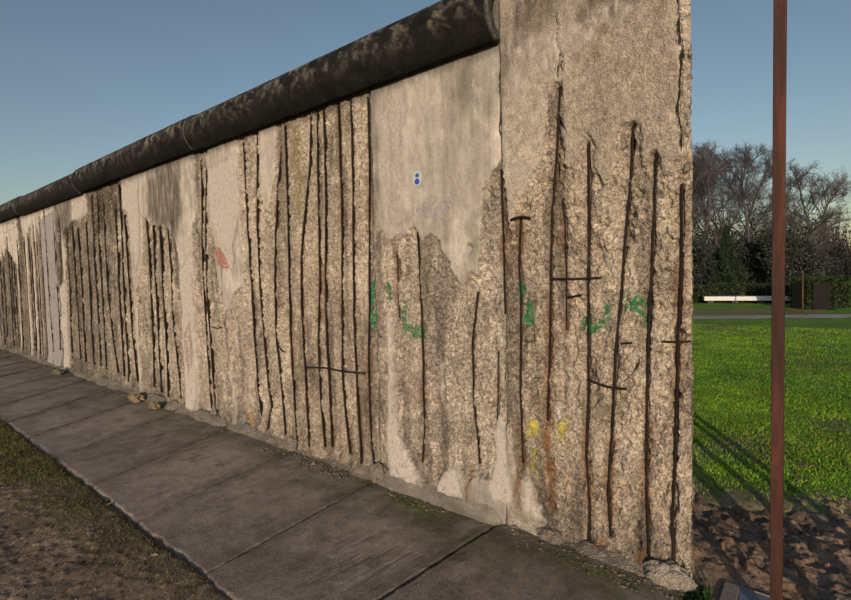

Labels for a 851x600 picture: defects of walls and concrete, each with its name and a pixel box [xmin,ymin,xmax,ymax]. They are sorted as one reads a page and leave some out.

spalling [0,0,695,578]
rust [543,425,555,509]